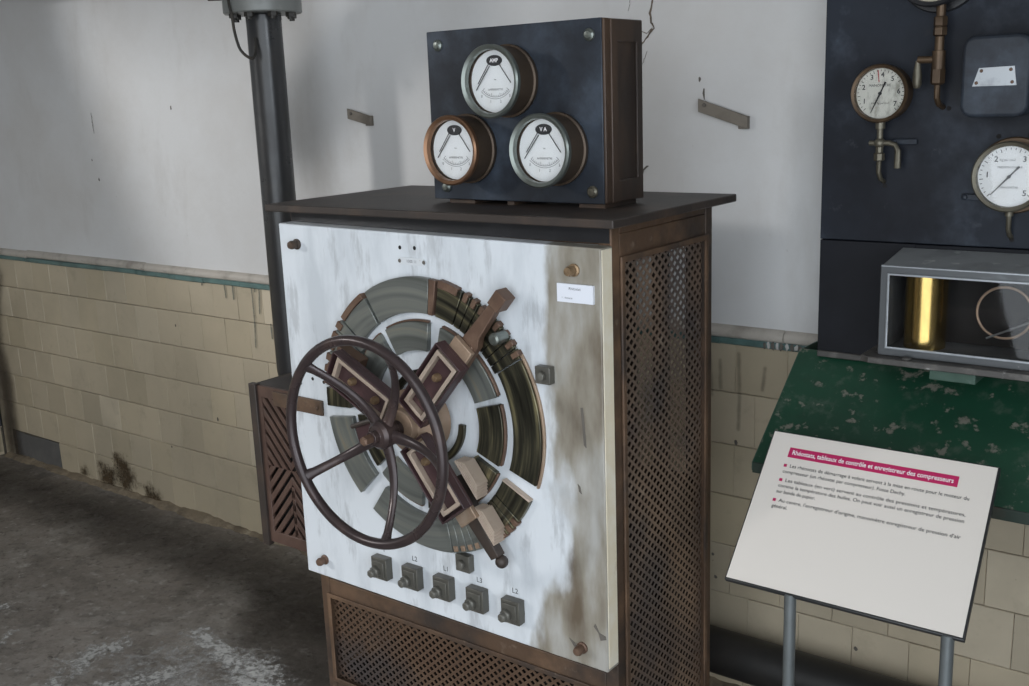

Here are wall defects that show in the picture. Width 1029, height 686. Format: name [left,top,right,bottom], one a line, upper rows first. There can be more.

crack [628,0,655,63]
damp [0,349,20,455]
damp [82,452,161,501]
damp [45,627,290,686]